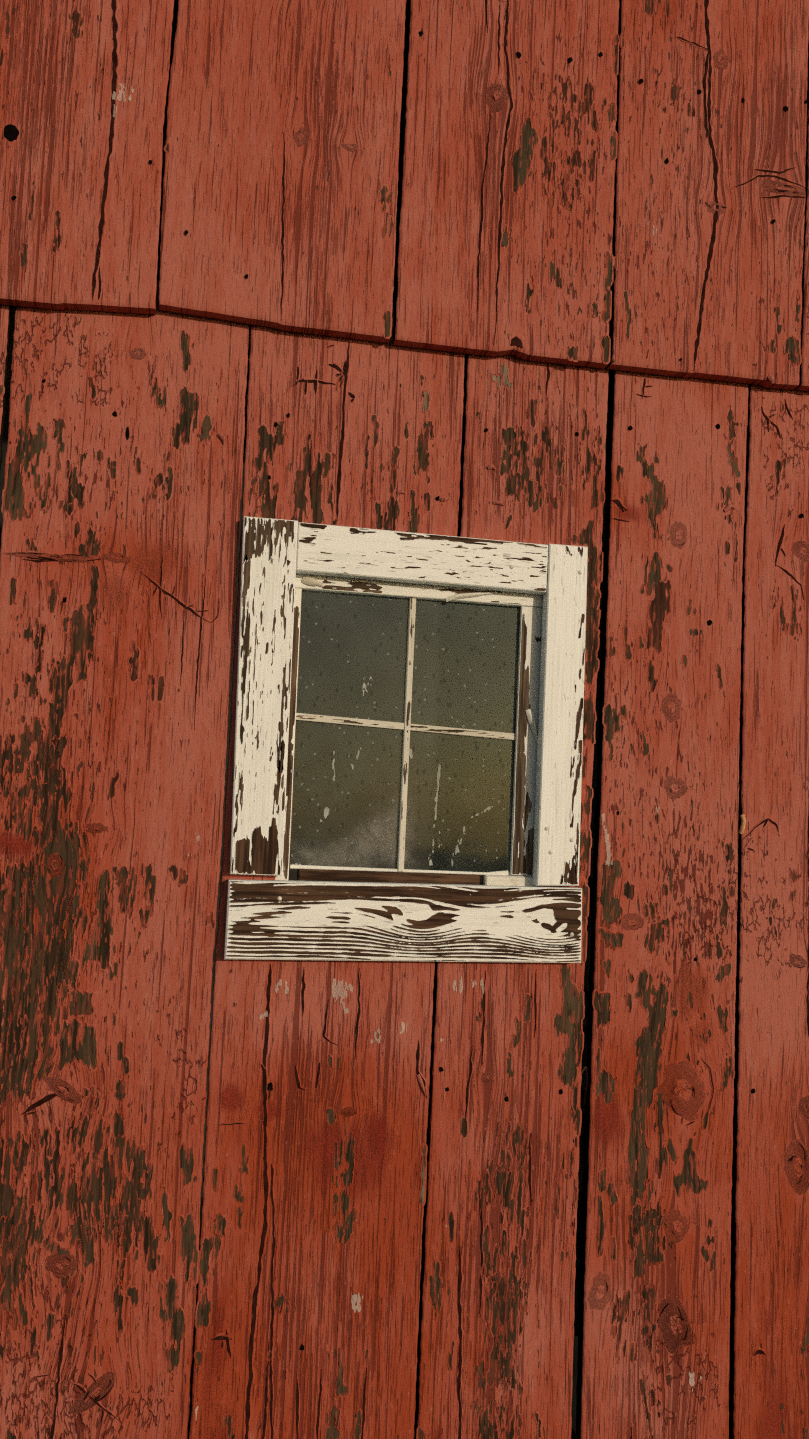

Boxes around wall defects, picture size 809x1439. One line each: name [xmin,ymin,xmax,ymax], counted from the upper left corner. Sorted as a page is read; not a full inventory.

crack [92,0,122,301]
crack [677,0,805,371]
peeling [135,329,226,502]
peeling [716,405,742,564]
peeling [0,392,250,1374]
peeling [204,374,736,1439]